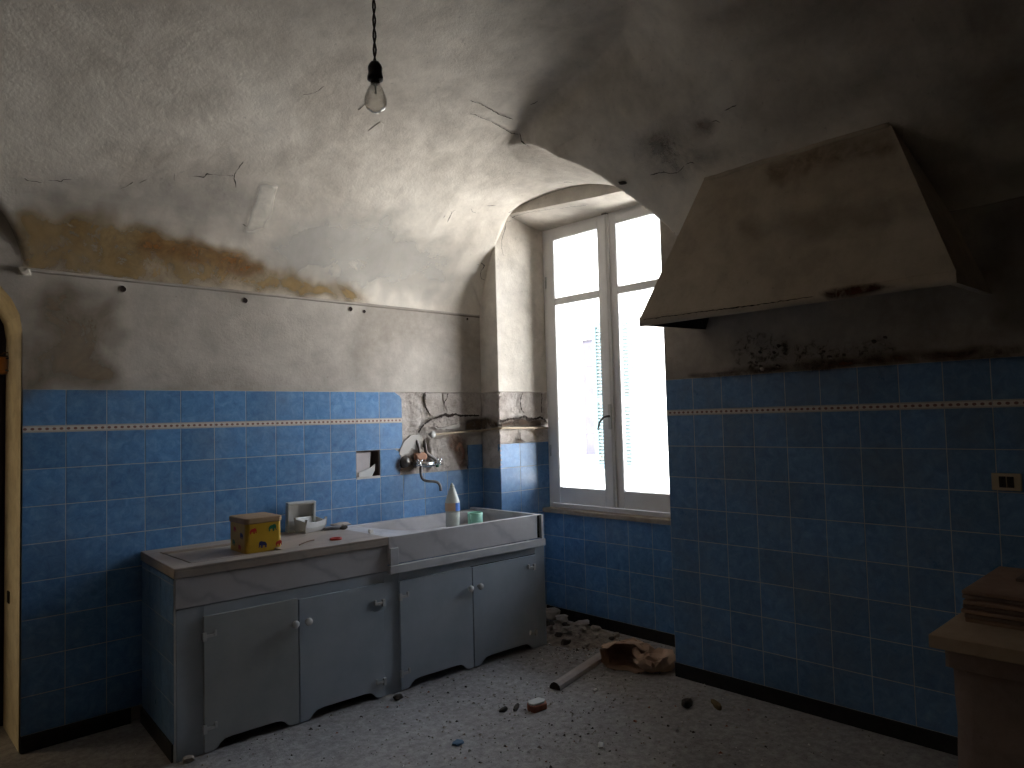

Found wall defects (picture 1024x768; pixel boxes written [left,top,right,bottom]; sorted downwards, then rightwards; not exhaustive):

crack [470,100,536,146]
water stain [18,213,359,302]
spalling [395,392,548,475]